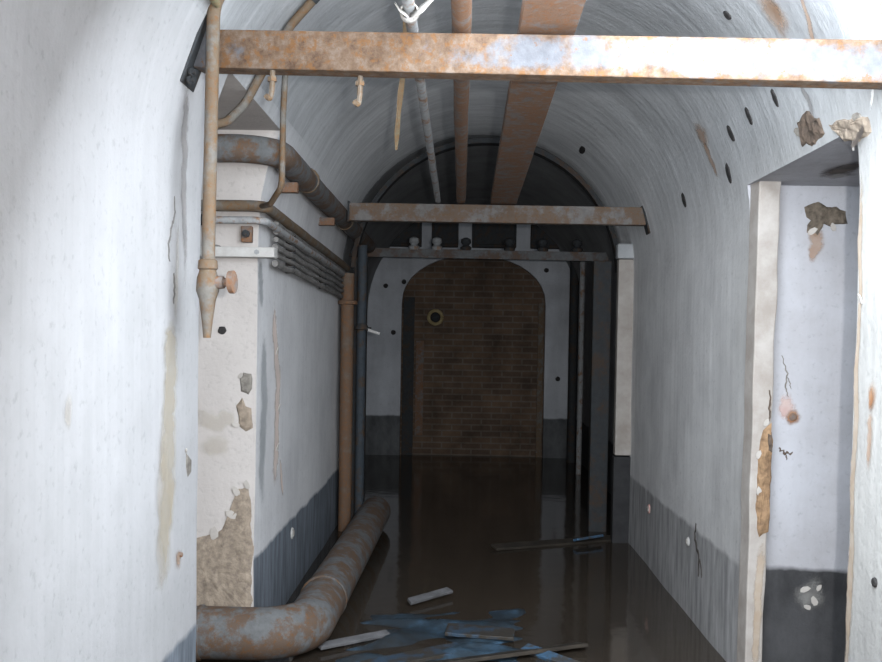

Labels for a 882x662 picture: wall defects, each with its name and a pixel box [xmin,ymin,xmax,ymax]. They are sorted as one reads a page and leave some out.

rust [762,0,784,30]
spalling [793,111,872,147]
spalling [804,202,848,259]
spalling [232,372,253,431]
crack [781,355,791,397]
rust [780,400,798,423]
peeling [755,390,773,537]
spalling [196,480,254,607]
peeling [752,553,765,662]